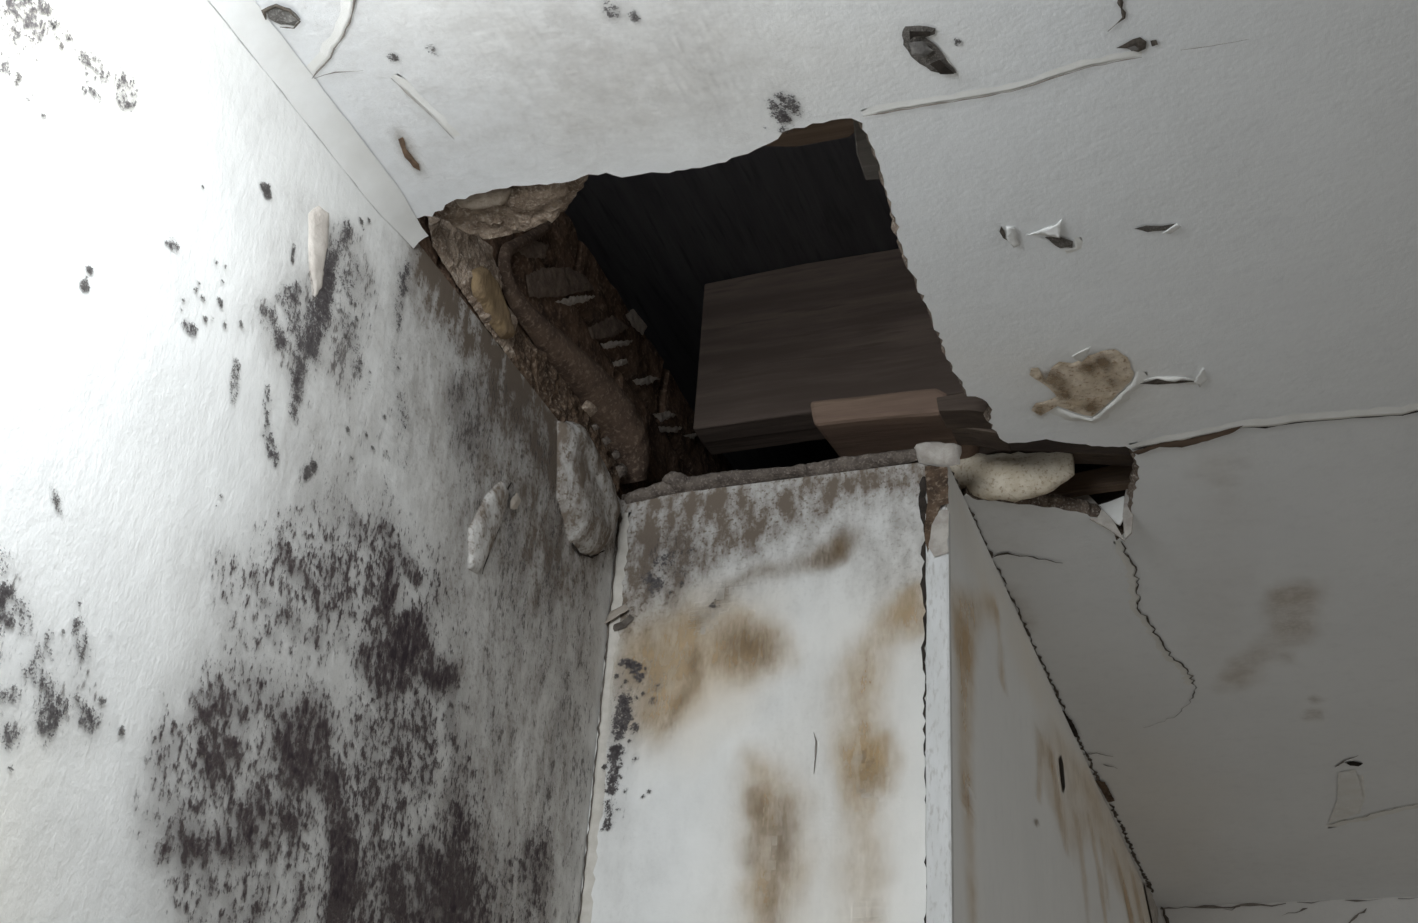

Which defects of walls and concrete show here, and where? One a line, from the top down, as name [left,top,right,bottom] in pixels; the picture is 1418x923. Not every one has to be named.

damp [0,0,139,126]
crack [306,0,356,79]
spalling [902,26,956,74]
crack [862,51,1142,117]
spalling [999,219,1083,253]
damp [260,217,377,424]
flaking render [417,211,949,557]
peeling [1029,346,1208,423]
crack [1130,403,1418,455]
damp [0,550,106,743]
damp [134,365,763,923]
crack [918,472,1418,923]